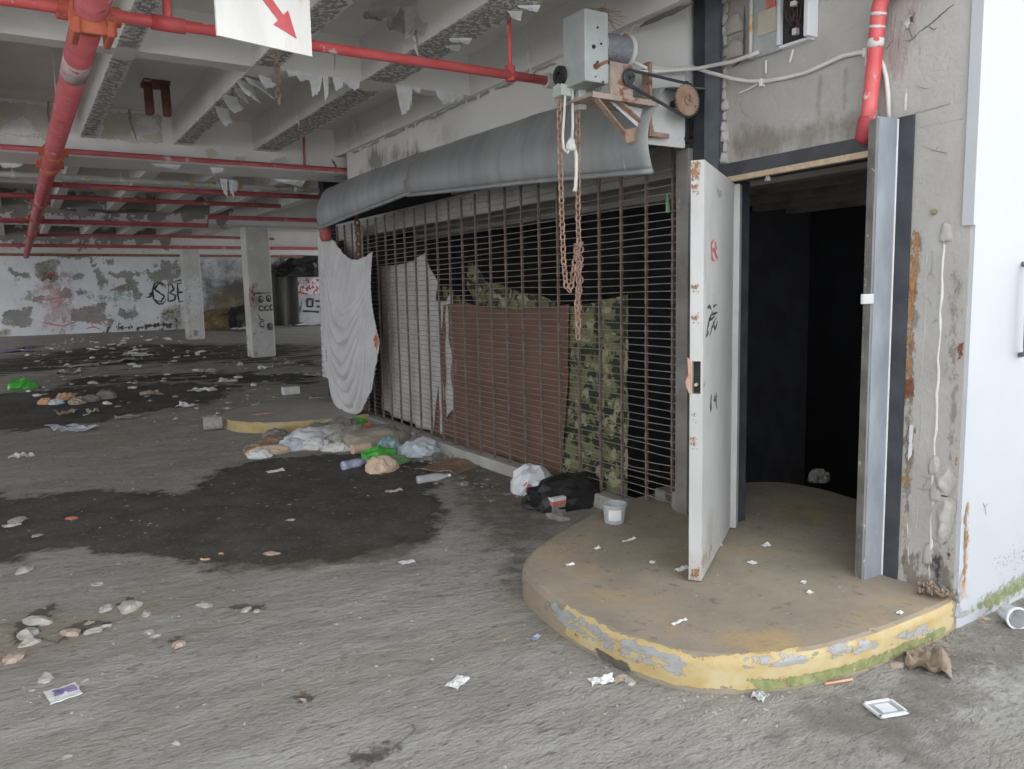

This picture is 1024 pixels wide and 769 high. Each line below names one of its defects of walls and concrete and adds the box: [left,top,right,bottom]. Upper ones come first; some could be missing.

peeling [215,75,275,127]
peeling [265,51,360,102]
peeling [275,179,305,187]
rust [689,161,701,195]
peeling [0,148,238,336]
rust [904,231,920,399]
rust [960,501,969,597]
peeling [546,601,687,676]
peeling [743,653,807,669]
peeling [827,638,879,660]
peeling [898,623,934,643]